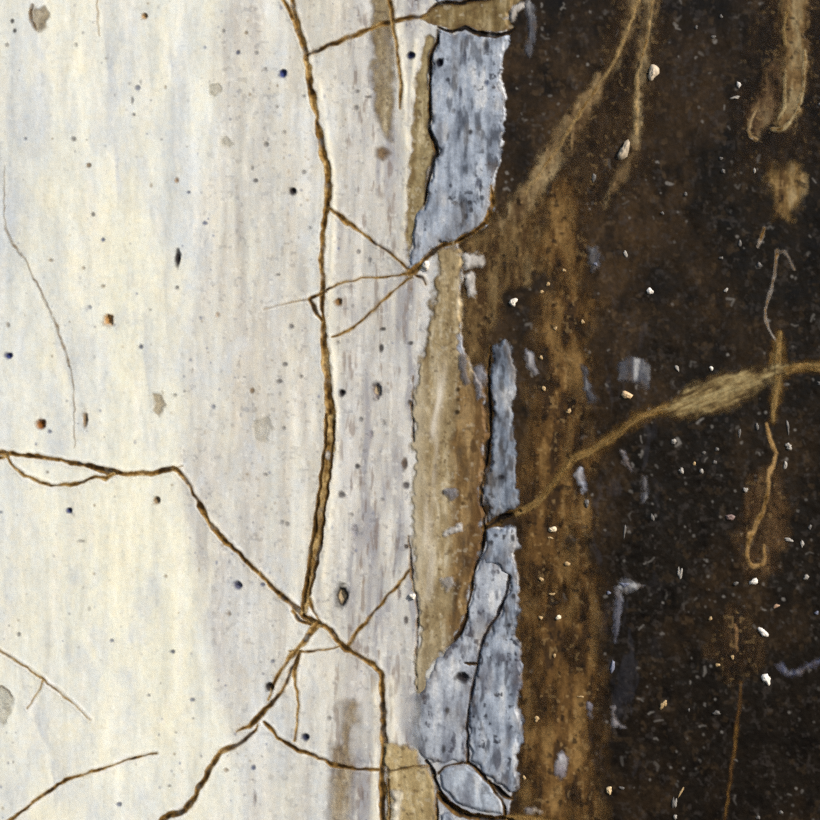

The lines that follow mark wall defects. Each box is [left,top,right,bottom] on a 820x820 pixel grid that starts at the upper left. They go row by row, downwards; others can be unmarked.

crack [0,0,495,820]
spalling [383,0,538,820]
crack [481,227,820,568]
crack [425,575,542,820]
crack [725,682,742,814]